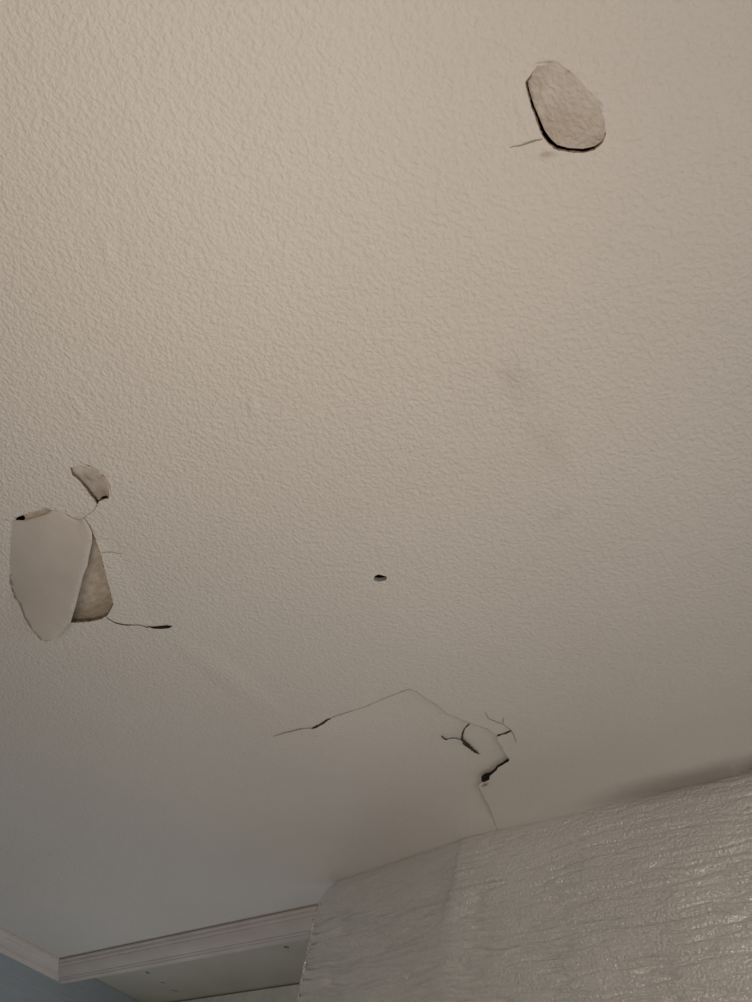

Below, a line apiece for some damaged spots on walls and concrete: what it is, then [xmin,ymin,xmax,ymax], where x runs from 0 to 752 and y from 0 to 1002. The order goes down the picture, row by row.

peeling [9,508,172,642]
crack [273,689,517,878]